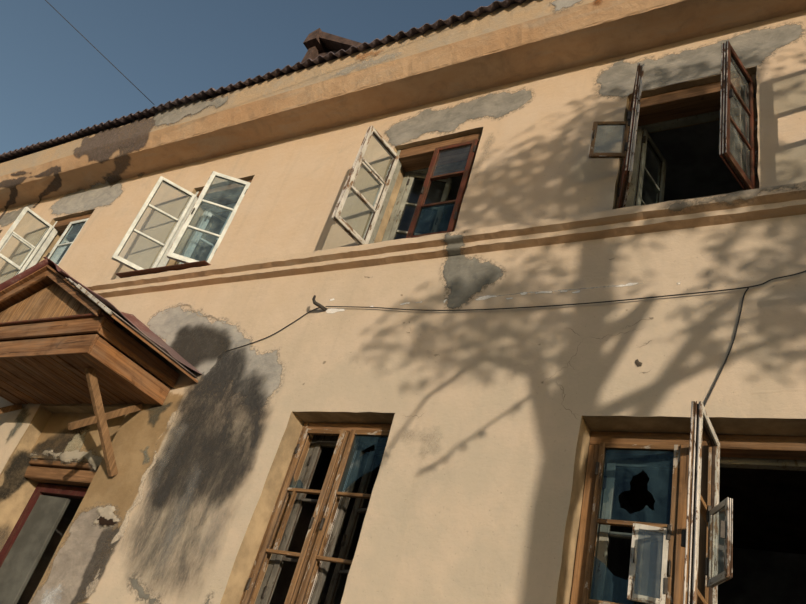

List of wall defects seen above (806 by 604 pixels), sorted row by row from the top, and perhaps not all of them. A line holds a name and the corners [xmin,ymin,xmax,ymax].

damp [0,166,62,219]
damp [149,403,170,427]
damp [134,451,231,581]